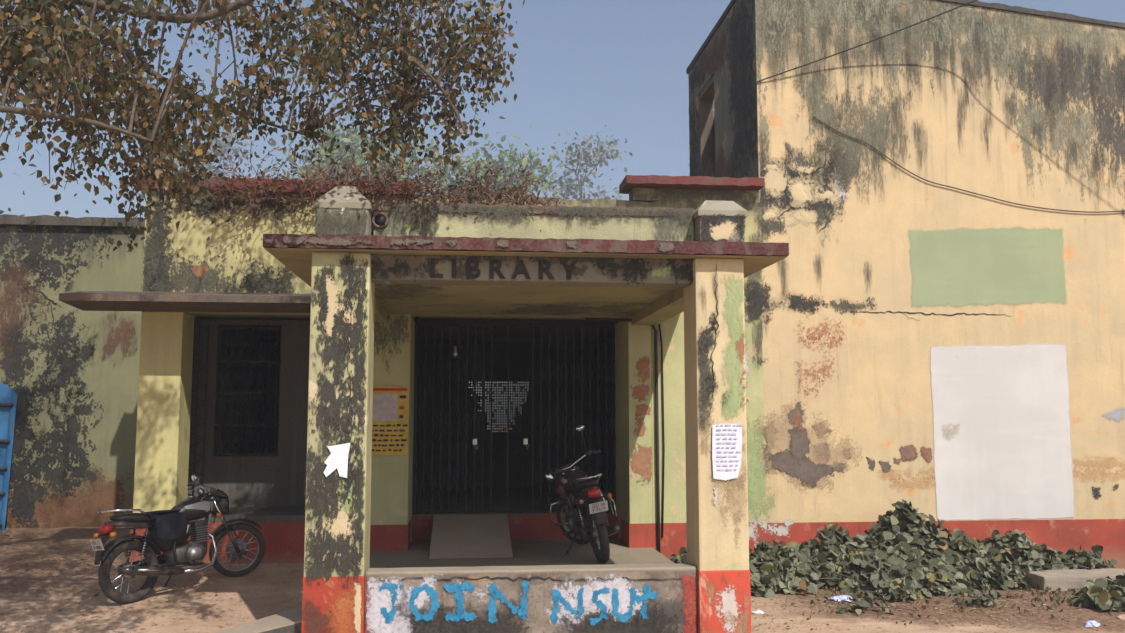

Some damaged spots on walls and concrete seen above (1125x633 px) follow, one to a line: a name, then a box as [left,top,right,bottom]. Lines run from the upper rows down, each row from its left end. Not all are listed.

water stain [725,0,1125,201]
water stain [141,191,297,293]
water stain [0,225,129,528]
water stain [304,254,694,588]
peeling [630,356,653,486]
water stain [697,278,731,429]
spalling [722,276,852,489]
water stain [744,259,876,365]
spalling [866,445,933,473]
crack [851,311,1005,321]
peeling [748,516,794,543]
peeling [326,578,362,633]